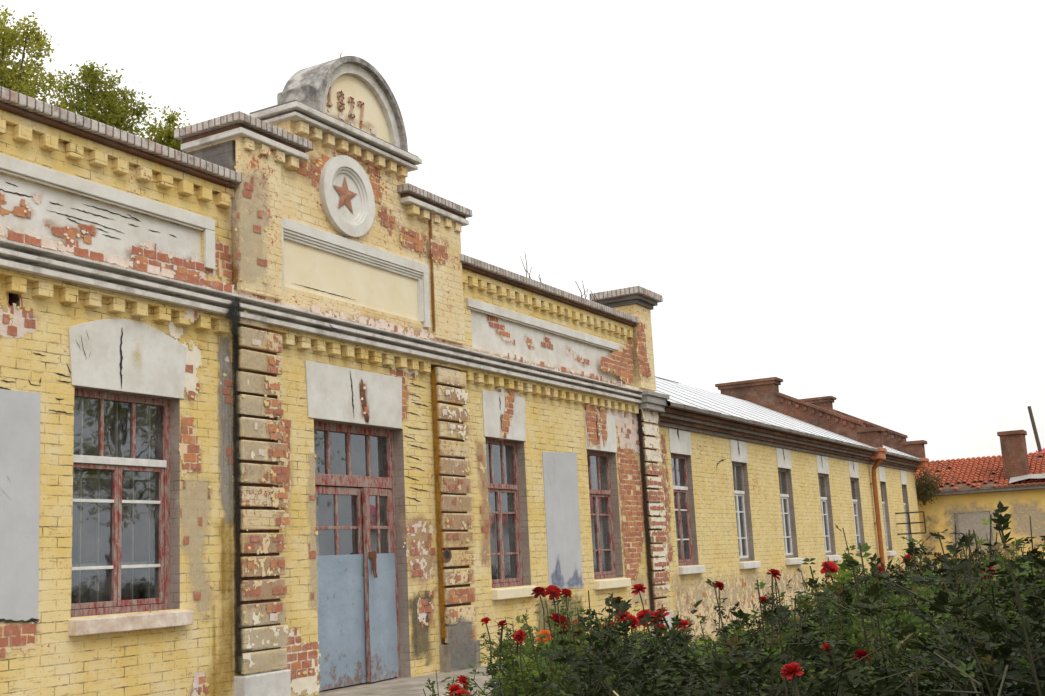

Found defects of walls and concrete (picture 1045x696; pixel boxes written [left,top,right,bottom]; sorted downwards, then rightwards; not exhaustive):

spalling [294,144,449,266]
crack [0,330,91,414]
crack [117,330,125,389]
spalling [0,166,321,696]
spalling [308,305,445,344]
spalling [455,314,652,391]
spalling [403,382,491,643]
spalling [585,404,806,642]